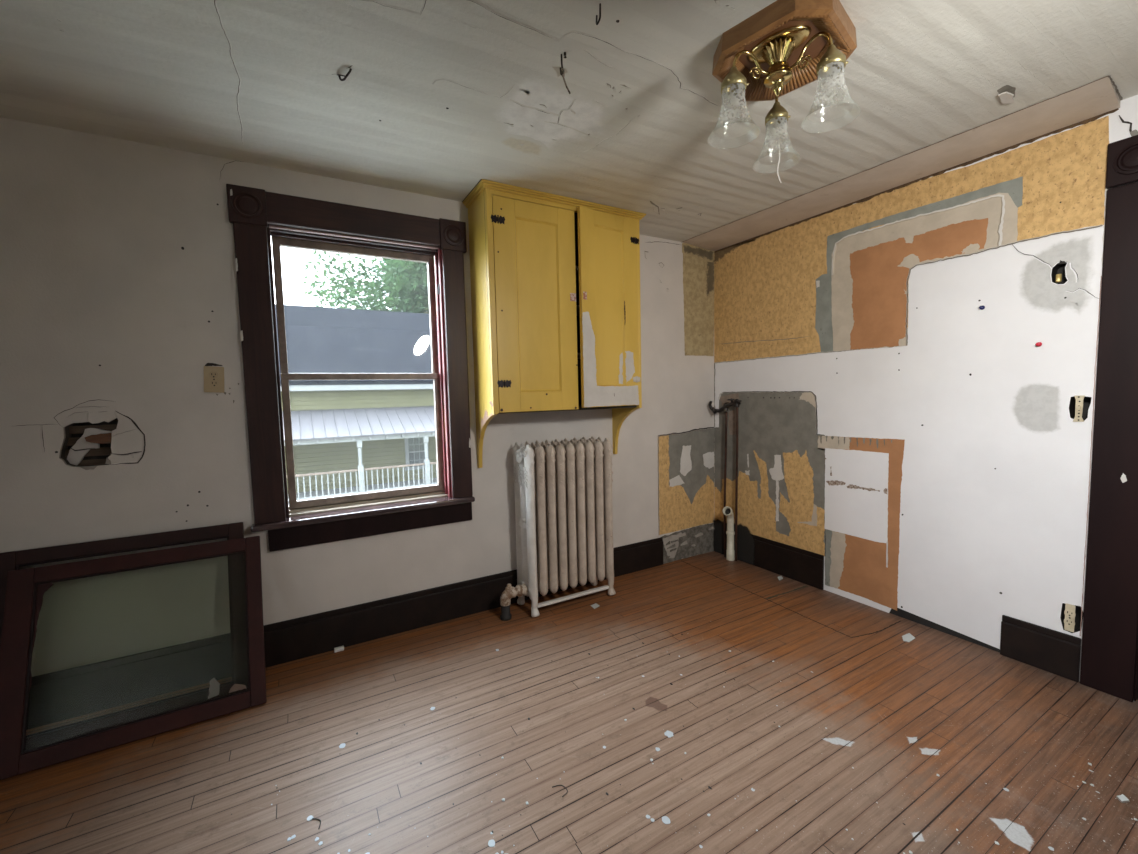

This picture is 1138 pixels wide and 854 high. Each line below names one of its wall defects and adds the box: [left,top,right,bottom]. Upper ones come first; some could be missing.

crack [214,0,243,145]
crack [432,78,588,135]
crack [469,0,730,110]
peeling [682,108,1119,363]
spalling [59,409,118,470]
flaking render [658,391,905,611]